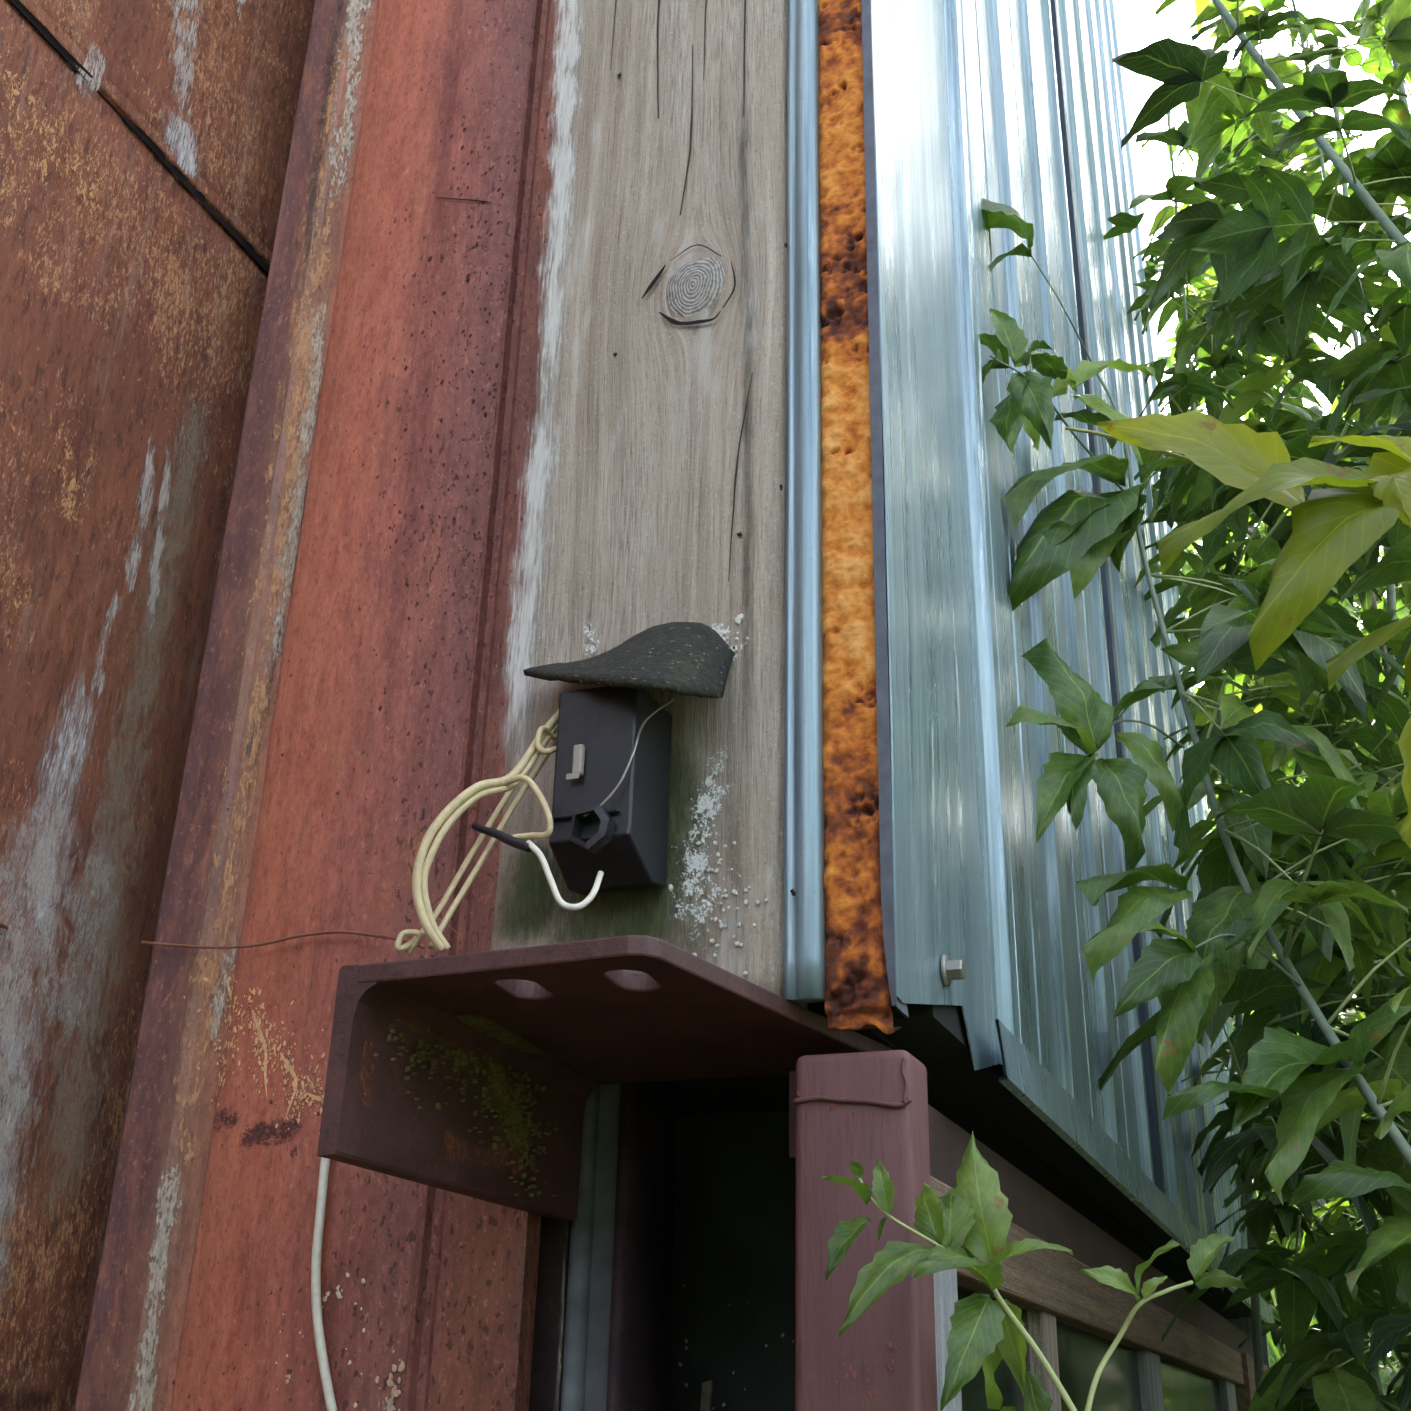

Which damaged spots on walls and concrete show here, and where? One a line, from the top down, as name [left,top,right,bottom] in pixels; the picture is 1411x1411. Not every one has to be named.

corrosion [0,50,115,244]
damp [76,46,105,94]
damp [167,0,203,177]
damp [506,0,583,751]
corrosion [37,420,102,523]
damp [0,436,171,1273]
corrosion [214,1108,302,1151]